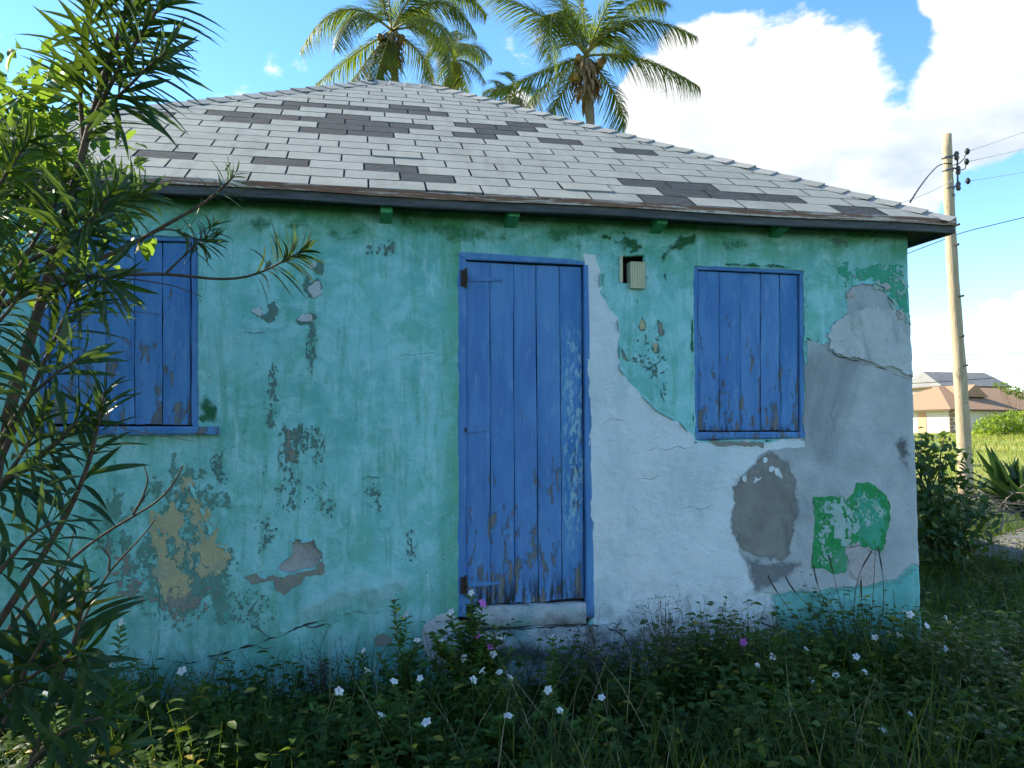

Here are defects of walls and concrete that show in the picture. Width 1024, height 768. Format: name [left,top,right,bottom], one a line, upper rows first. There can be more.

peeling [251,301,278,323]
peeling [296,312,317,374]
peeling [302,260,324,298]
peeling [91,451,325,633]
peeling [254,363,336,553]
peeling [583,254,919,676]
leakage [731,452,800,590]
crack [158,595,382,664]